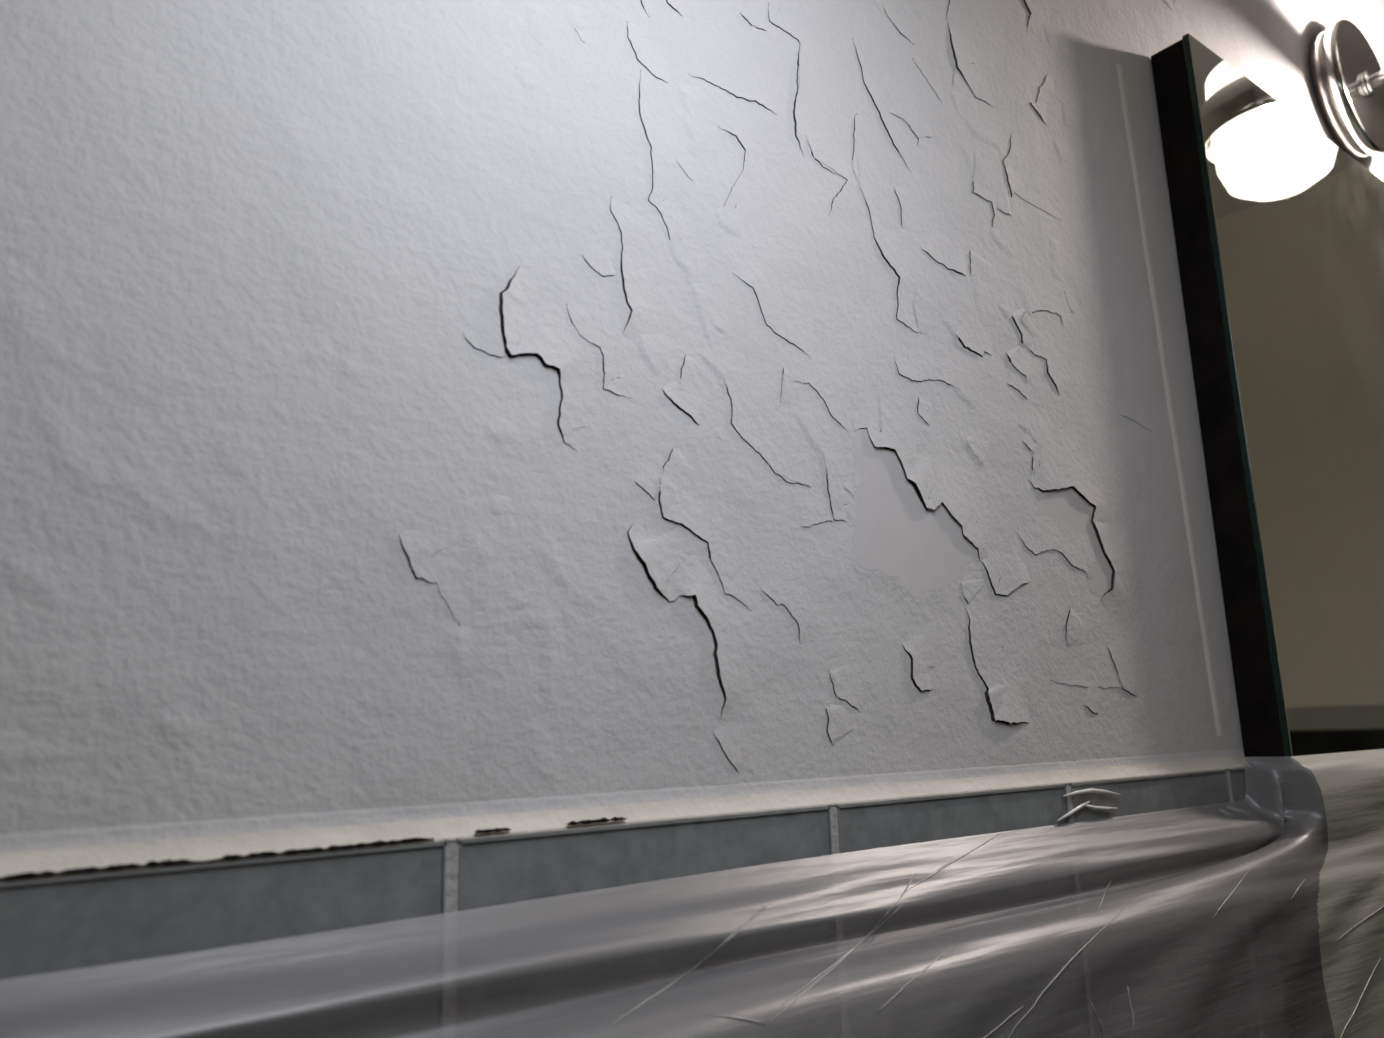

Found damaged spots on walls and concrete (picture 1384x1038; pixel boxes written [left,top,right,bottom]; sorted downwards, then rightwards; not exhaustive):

peeling [640,0,686,17]
peeling [463,266,597,452]
peeling [582,196,662,343]
flaking render [688,0,1142,624]
peeling [627,457,763,773]